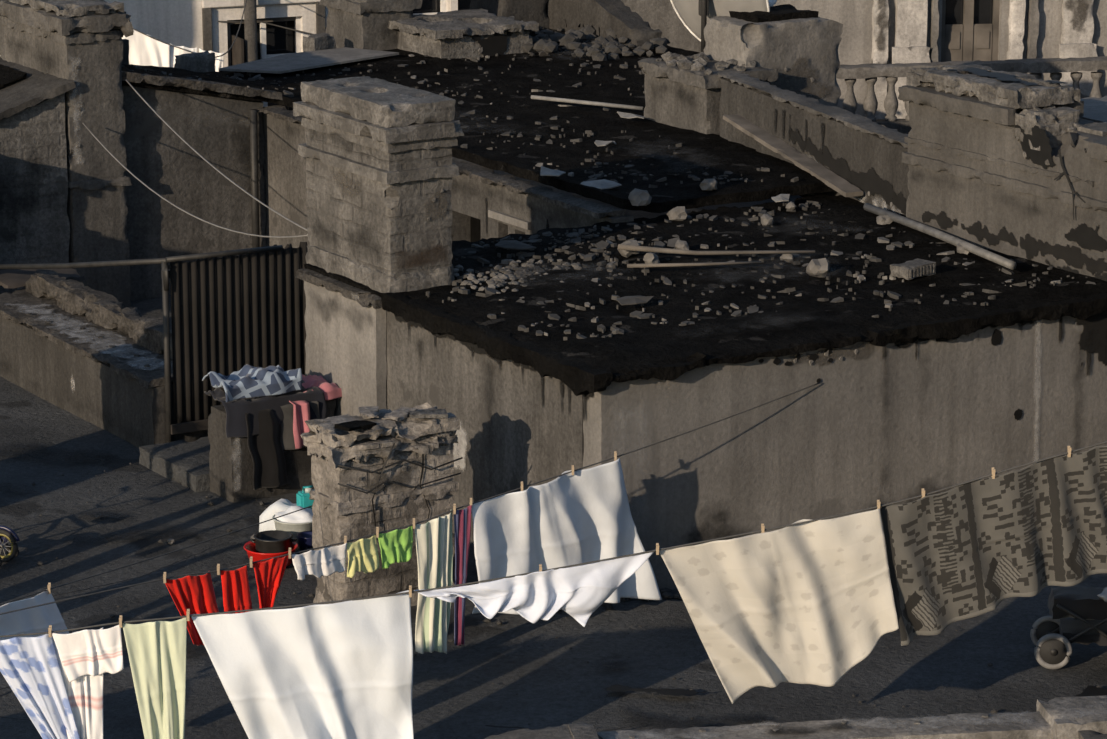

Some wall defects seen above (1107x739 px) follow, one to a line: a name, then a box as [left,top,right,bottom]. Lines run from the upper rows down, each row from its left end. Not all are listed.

spalling [1015,125,1056,169]
spalling [922,211,1107,275]
crack [406,454,430,522]